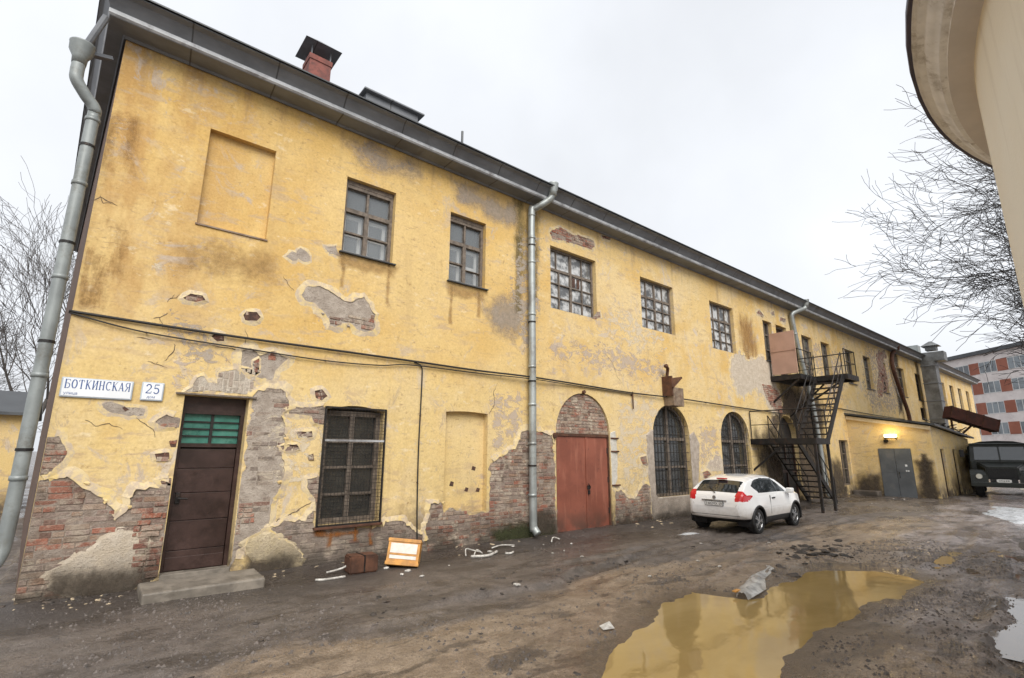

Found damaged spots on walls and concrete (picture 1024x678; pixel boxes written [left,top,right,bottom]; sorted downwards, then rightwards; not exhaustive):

peeling [282,246,312,265]
flaking render [295,277,380,337]
water stain [458,184,536,311]
flaking render [486,225,611,352]
flaking render [13,399,181,604]
flaking render [164,290,557,571]
flaking render [613,398,658,525]
water stain [916,454,938,499]